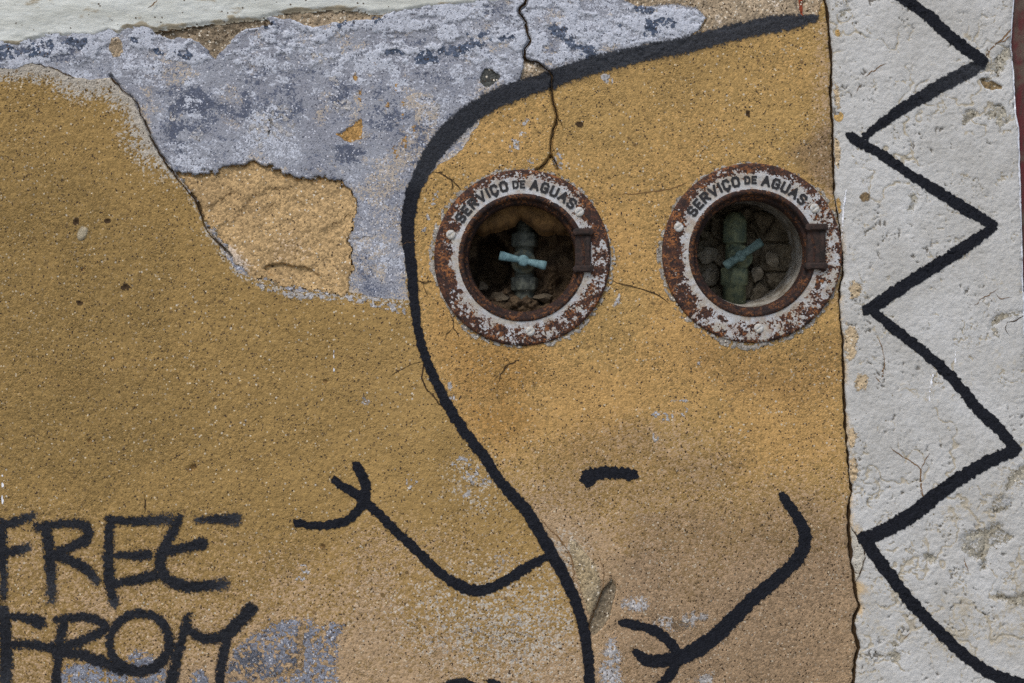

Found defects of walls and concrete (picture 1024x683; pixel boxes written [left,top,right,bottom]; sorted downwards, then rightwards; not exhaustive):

crack [111,77,303,255]
peeling [0,0,823,315]
crack [518,0,562,170]
crack [823,0,884,683]